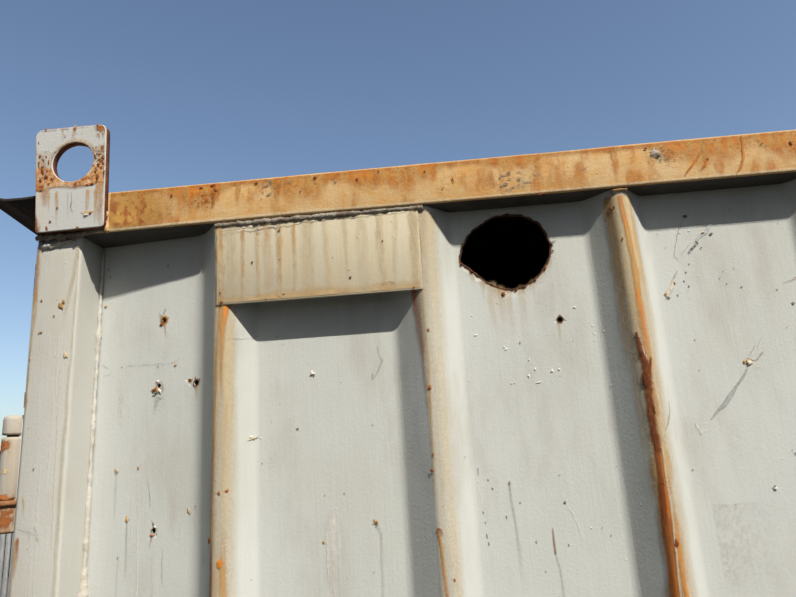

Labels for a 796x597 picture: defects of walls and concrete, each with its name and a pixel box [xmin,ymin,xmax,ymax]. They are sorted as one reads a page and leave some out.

corrosion [36,124,796,228]
corrosion [208,205,436,597]
corrosion [604,194,690,597]
corrosion [0,510,13,527]
corrosion [437,528,456,597]